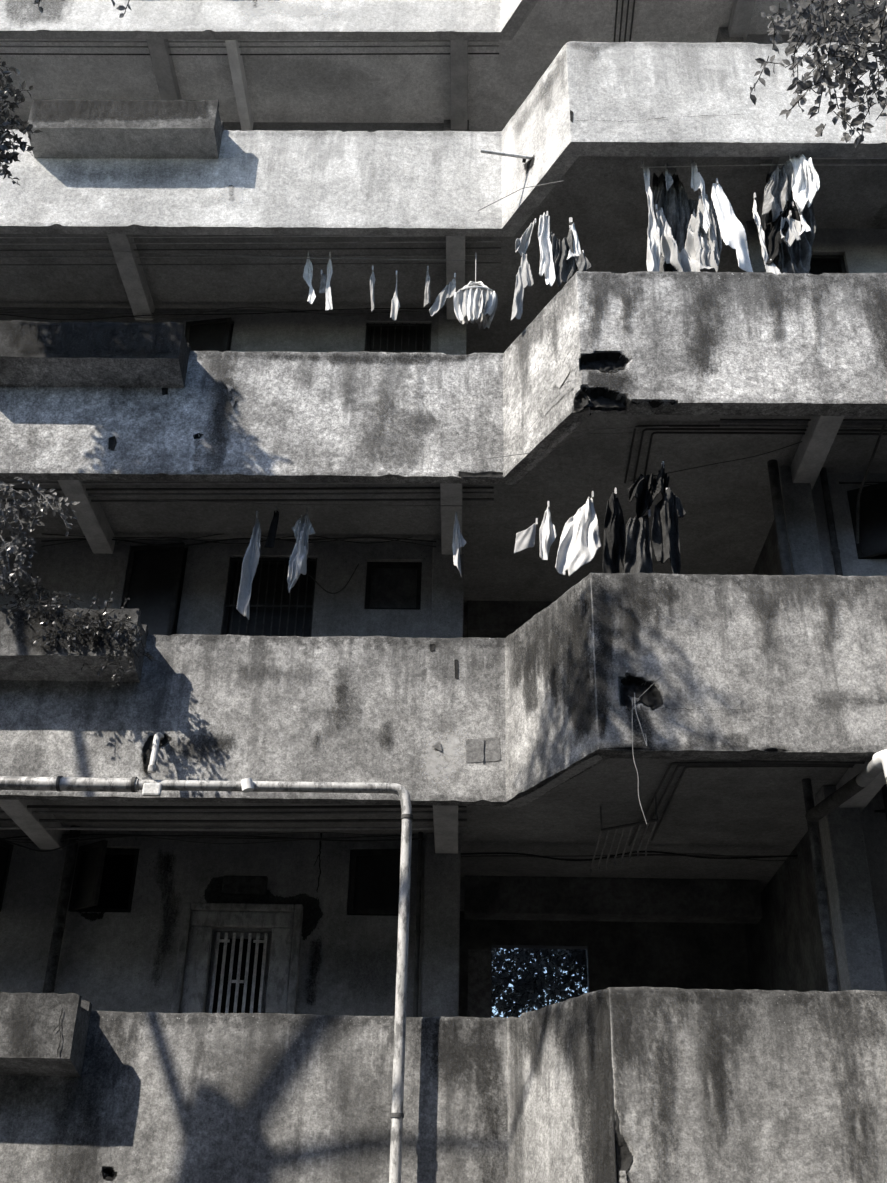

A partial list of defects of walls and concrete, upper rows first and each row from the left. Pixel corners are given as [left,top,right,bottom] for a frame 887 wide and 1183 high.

water stain [269,353,468,365]
water stain [581,271,643,342]
spalling [573,352,678,412]
water stain [684,280,732,374]
water stain [761,275,887,364]
water stain [12,610,114,654]
water stain [509,573,678,745]
water stain [171,734,236,761]
spalling [601,675,663,750]
peeling [203,876,323,940]
water stain [415,1018,507,1183]
water stain [509,988,752,1183]